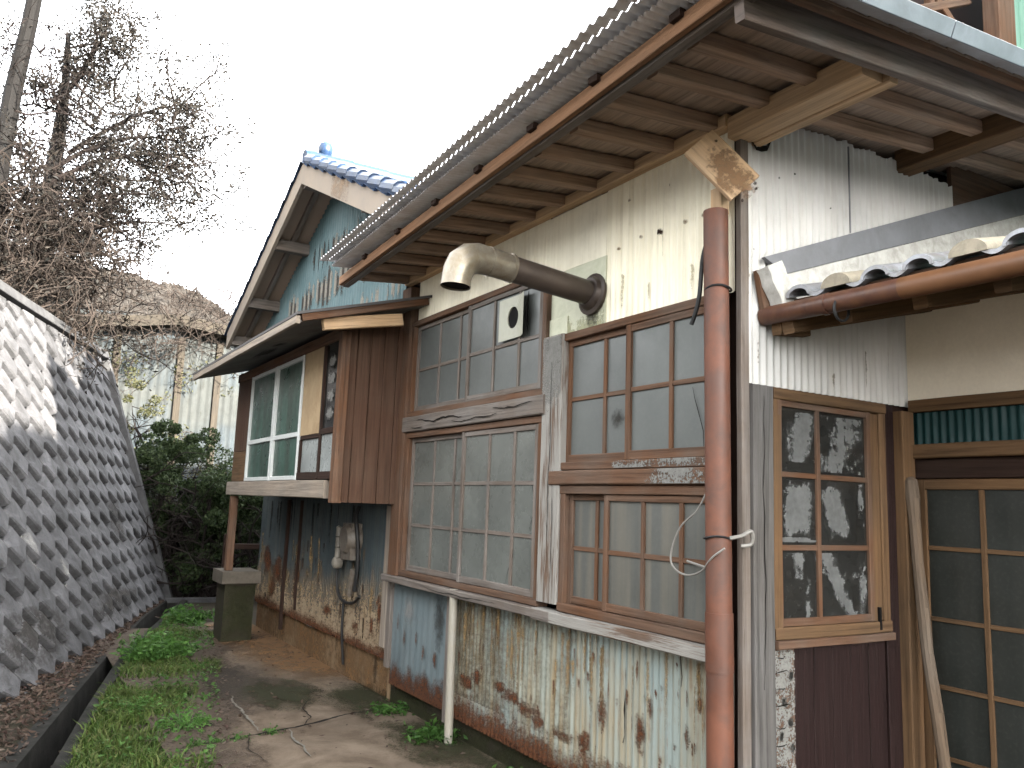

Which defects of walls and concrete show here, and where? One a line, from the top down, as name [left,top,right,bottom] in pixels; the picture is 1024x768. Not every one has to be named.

peeling [612,457,705,483]
corrosion [255,532,623,768]
corrosion [626,652,678,756]
corrosion [686,663,703,731]